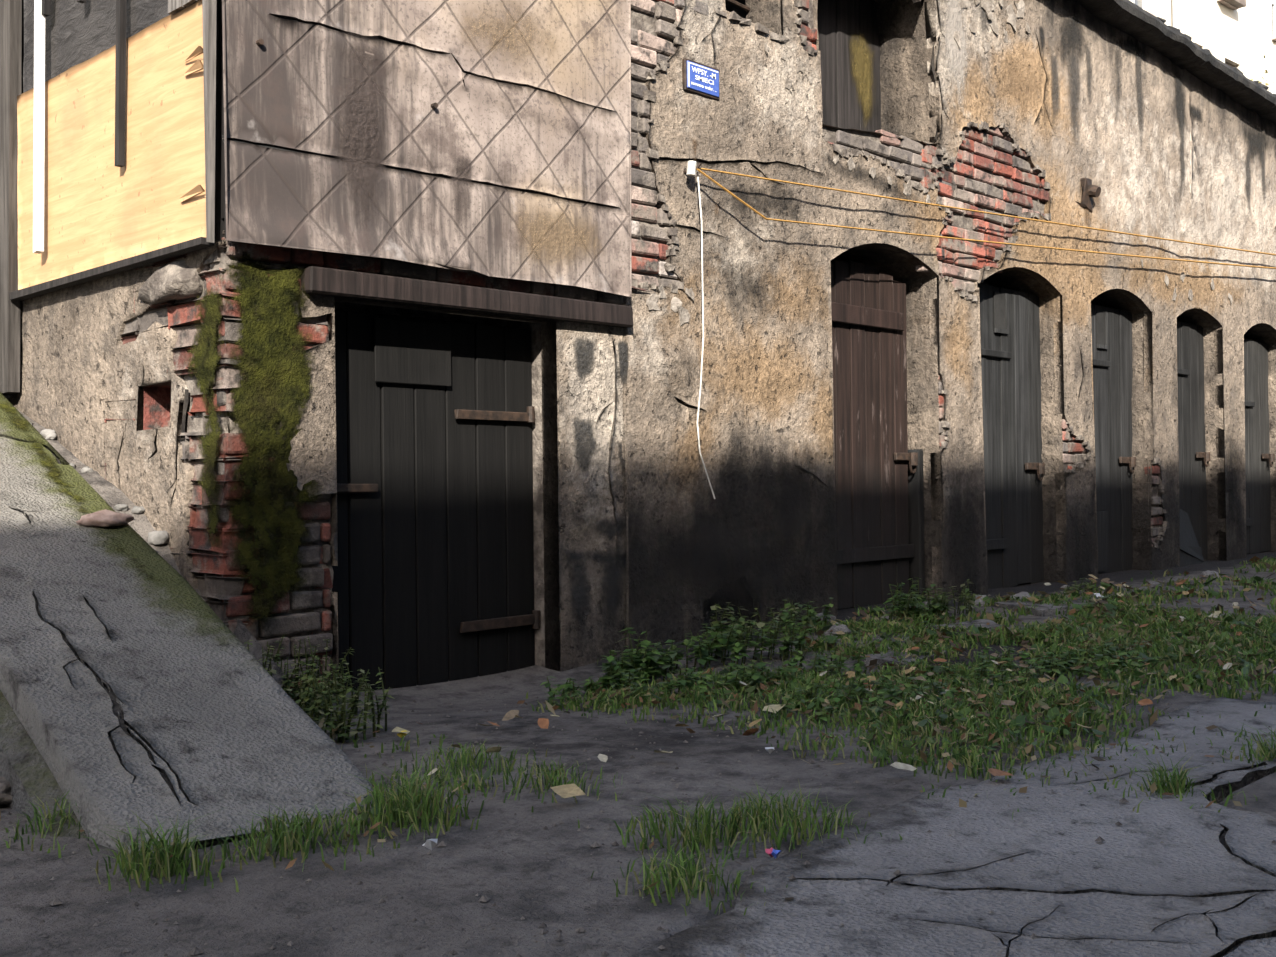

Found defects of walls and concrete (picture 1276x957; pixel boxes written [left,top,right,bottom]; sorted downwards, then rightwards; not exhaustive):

flaking render [631,0,709,326]
flaking render [764,0,818,90]
peeling [852,38,872,116]
flaking render [822,121,1051,303]
leakage [1040,7,1092,129]
leakage [1116,36,1146,123]
leakage [1175,75,1201,186]
leakage [1245,125,1268,207]
flaking render [121,245,333,701]
crack [32,594,189,802]
crack [1219,830,1231,854]
crack [1215,930,1276,957]